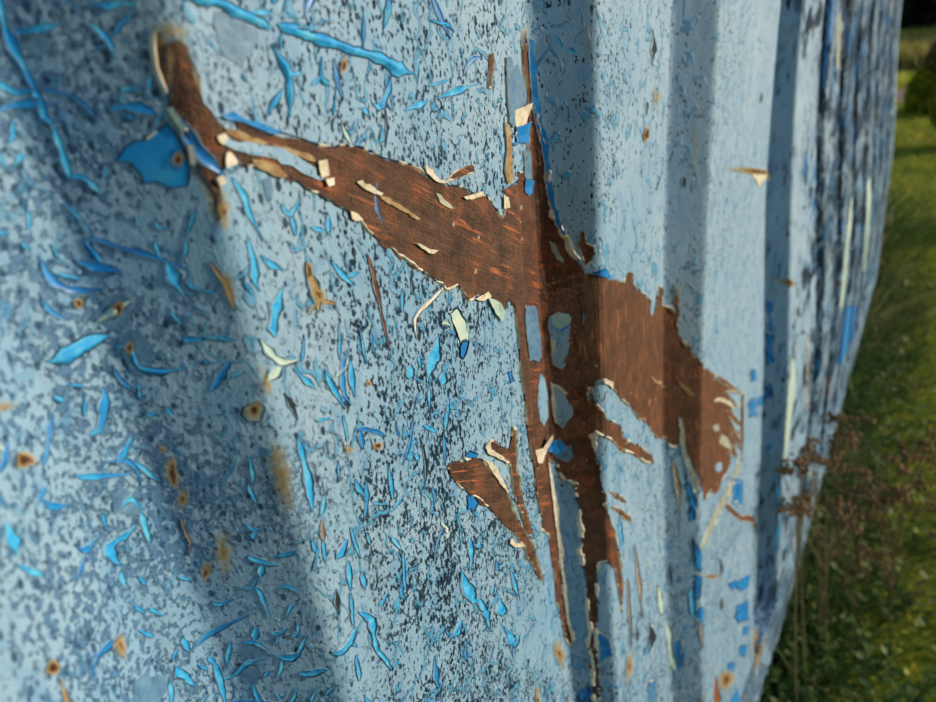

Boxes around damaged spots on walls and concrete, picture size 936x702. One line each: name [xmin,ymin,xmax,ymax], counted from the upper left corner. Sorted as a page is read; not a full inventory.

peeling [504,57,532,184]
peeling [224,128,325,201]
peeling [380,196,420,220]
peeling [435,193,453,209]
peeling [449,307,470,360]
peeling [524,305,570,369]
peeling [537,374,573,428]
corrosion [160,446,186,506]
peeling [466,494,479,512]
peeling [678,417,703,522]
peeling [693,461,743,630]
peeling [727,574,751,673]